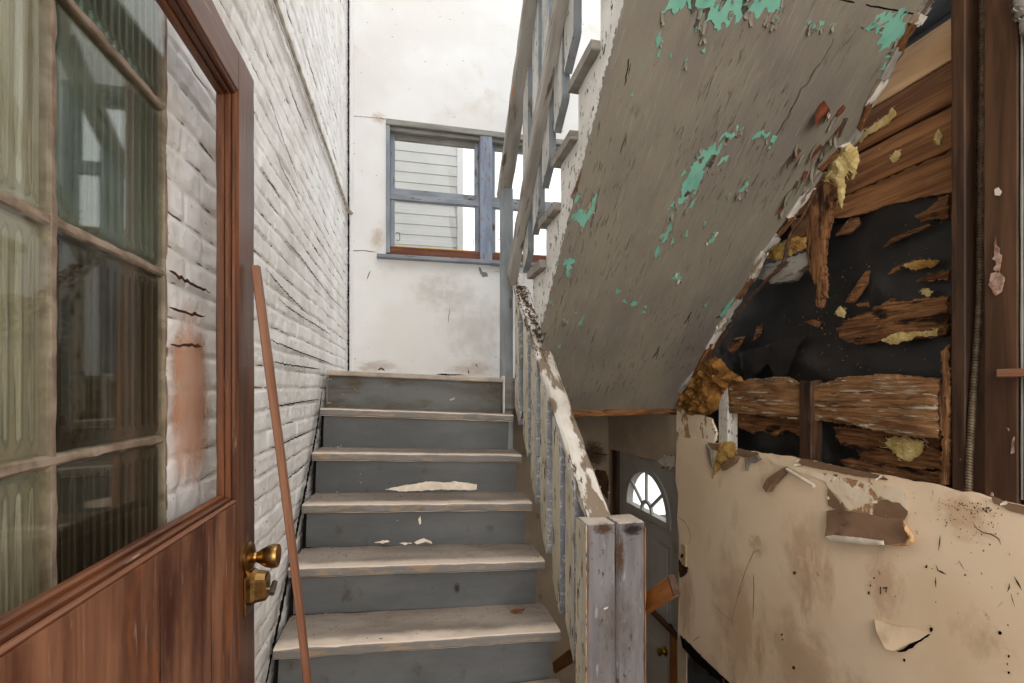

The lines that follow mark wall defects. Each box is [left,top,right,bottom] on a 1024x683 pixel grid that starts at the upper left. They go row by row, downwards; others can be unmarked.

peeling [654,0,785,64]
peeling [865,7,908,70]
peeling [570,167,597,232]
peeling [654,124,778,258]
peeling [777,101,848,218]
crack [169,270,211,317]
crack [171,341,203,349]
leakage [176,327,206,474]
peeling [386,481,477,492]
flaking render [594,468,610,501]
flaking render [680,635,730,683]
flaking render [874,620,929,651]